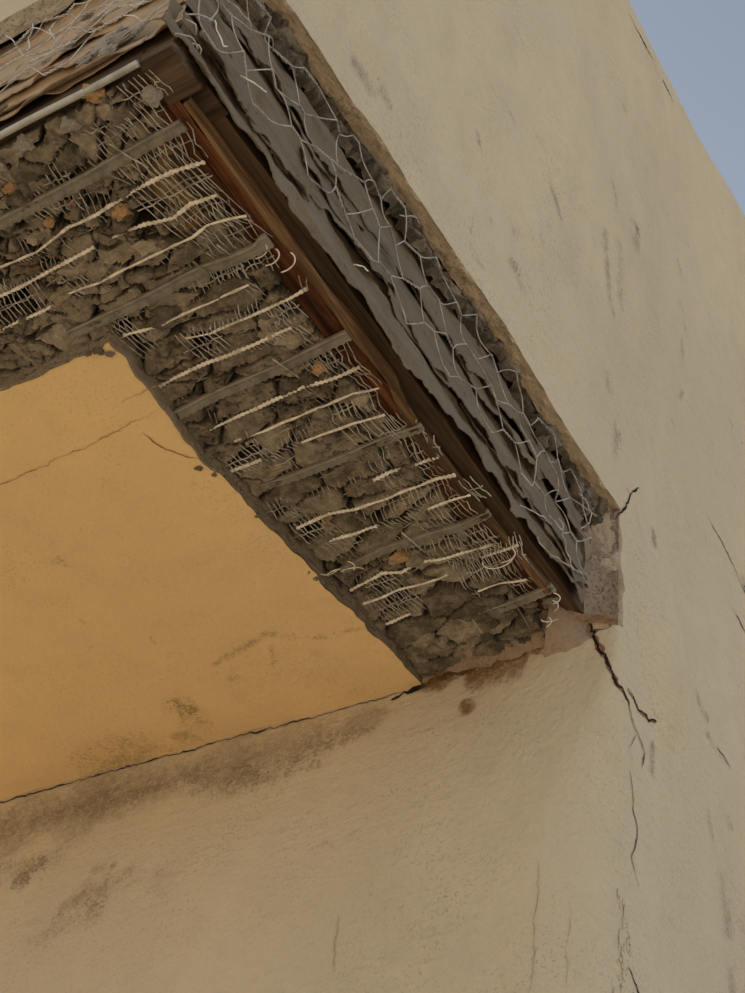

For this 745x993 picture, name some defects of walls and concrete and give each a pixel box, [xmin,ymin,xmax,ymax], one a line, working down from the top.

crack [0,384,191,485]
spalling [0,0,625,701]
crack [615,487,638,519]
crack [587,623,657,884]